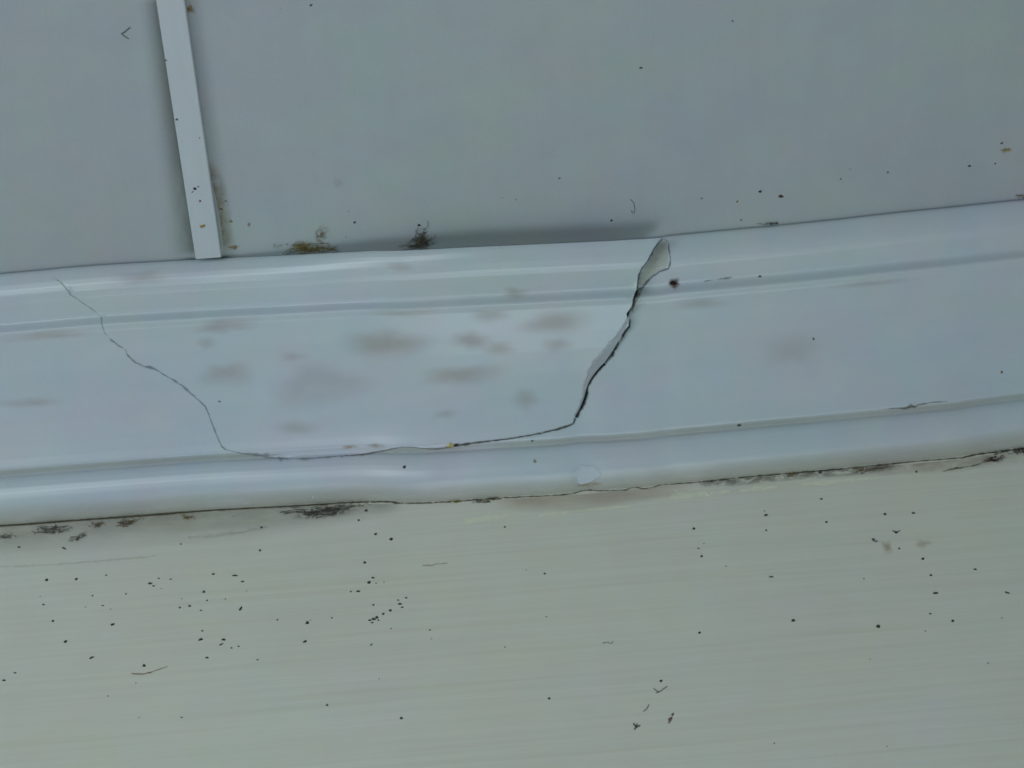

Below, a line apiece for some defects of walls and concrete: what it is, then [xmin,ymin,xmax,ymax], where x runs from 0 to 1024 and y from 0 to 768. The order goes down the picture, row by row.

crack [345,239,671,456]